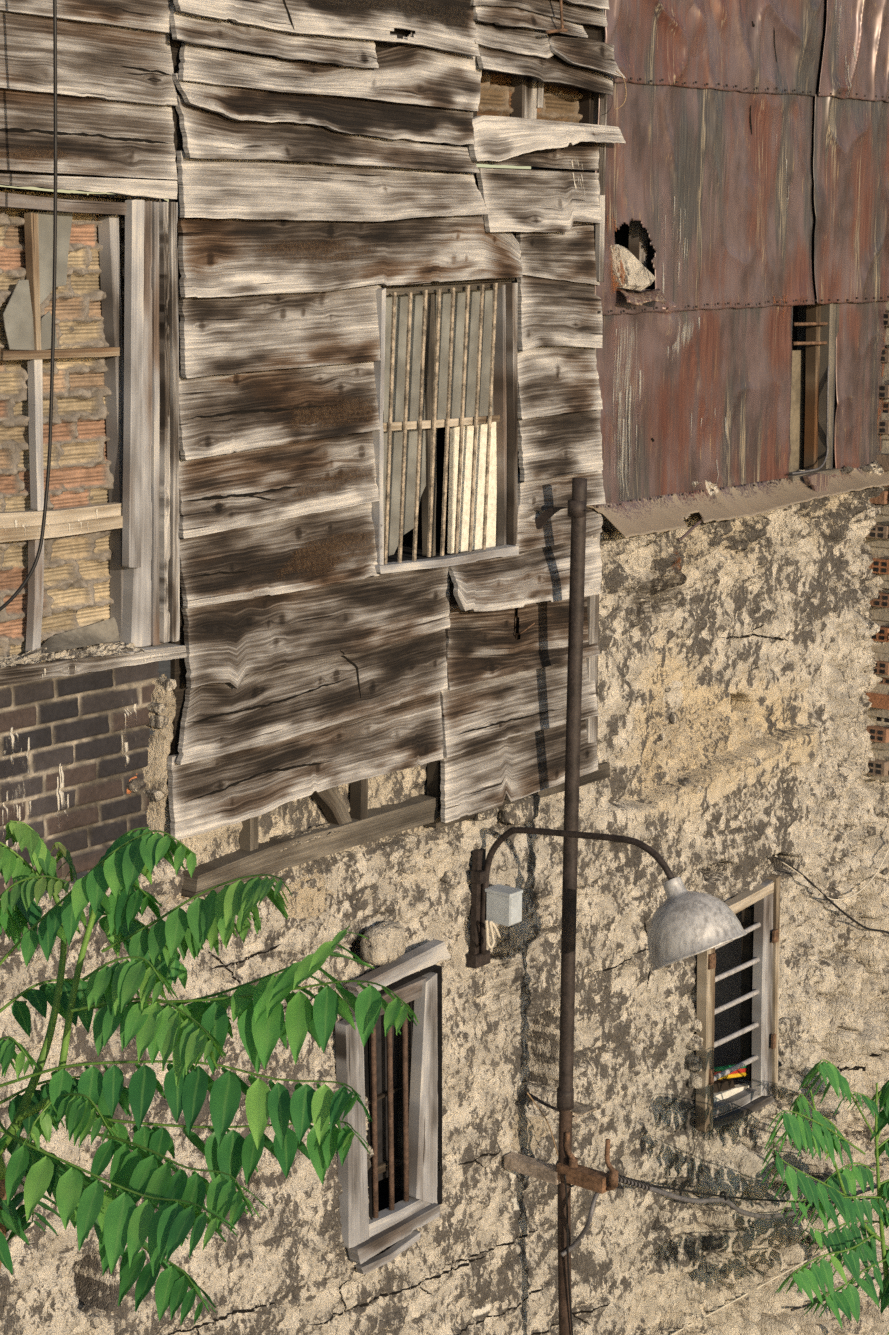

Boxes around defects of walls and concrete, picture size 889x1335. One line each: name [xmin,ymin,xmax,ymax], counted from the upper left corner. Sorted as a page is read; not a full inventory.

spalling [820,301,889,782]